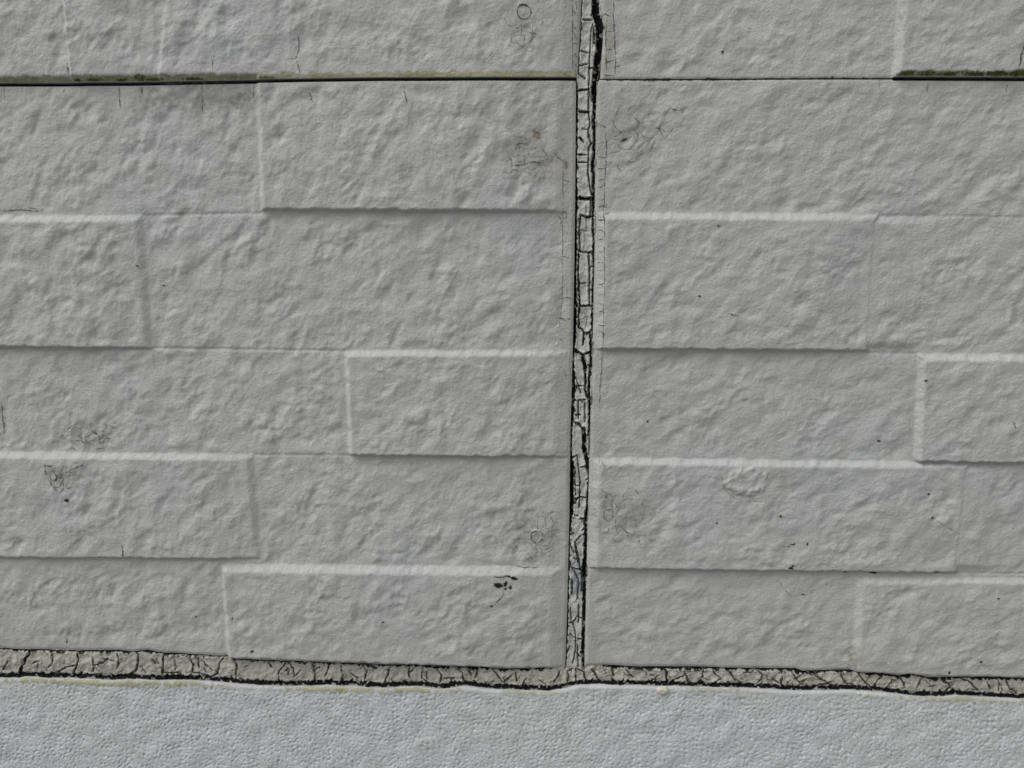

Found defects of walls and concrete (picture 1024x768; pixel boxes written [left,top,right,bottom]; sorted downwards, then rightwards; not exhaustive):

crack [489,4,543,57]
crack [572,1,583,49]
crack [606,74,696,82]
crack [704,76,889,86]
crack [613,107,672,155]
crack [506,137,560,177]
crack [44,422,117,492]
crack [602,463,640,542]
crack [516,516,558,568]